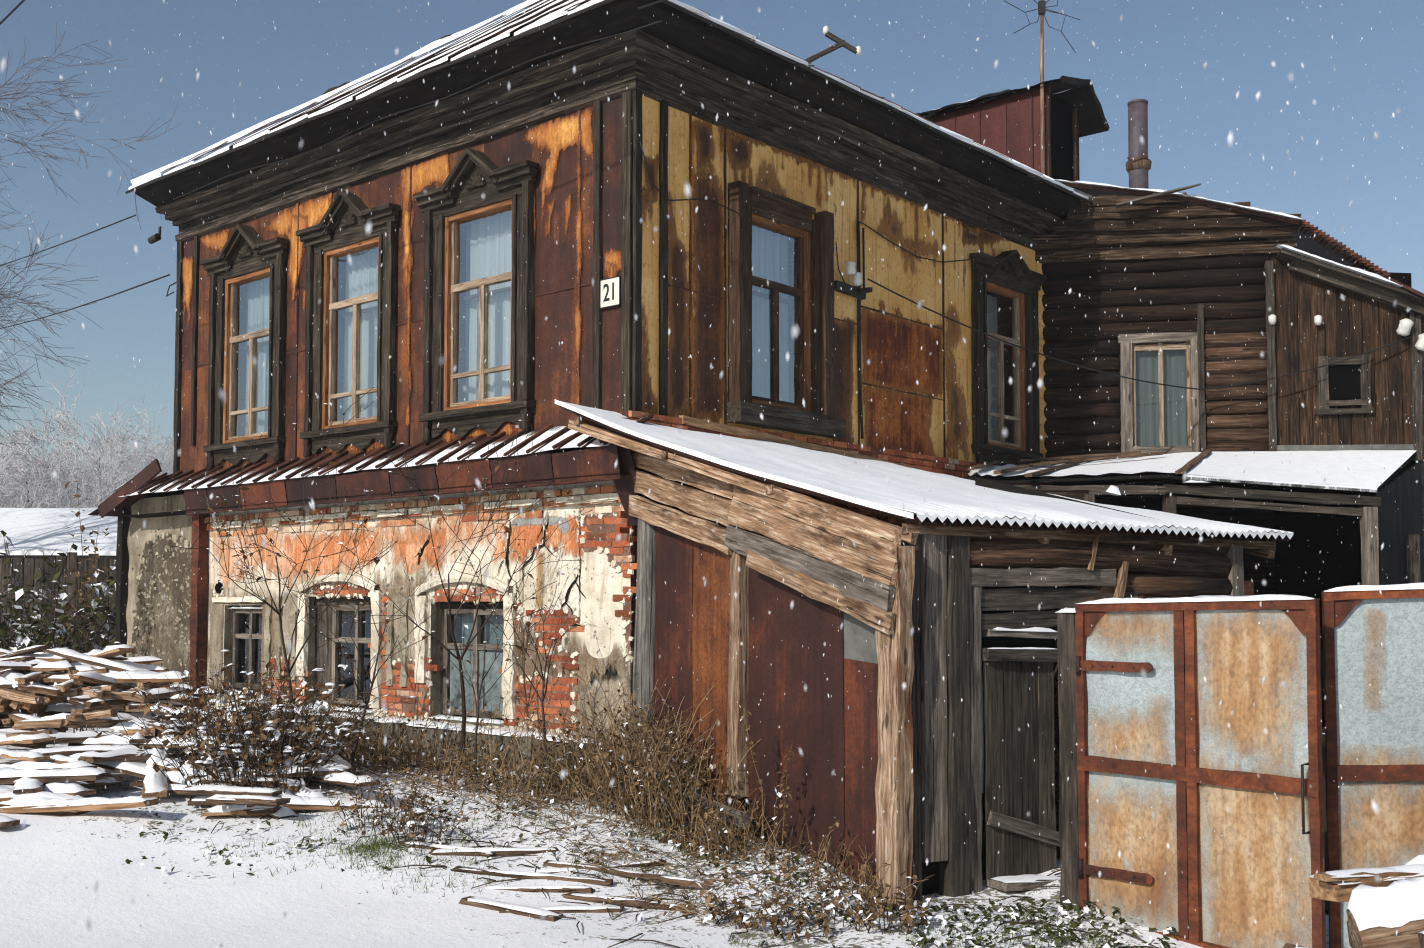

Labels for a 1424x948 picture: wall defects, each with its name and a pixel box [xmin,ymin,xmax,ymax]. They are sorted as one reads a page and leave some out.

corrosion [641,119,1008,423]
corrosion [833,301,969,461]
spalling [213,529,441,721]
spalling [429,583,585,735]
spalling [399,512,637,663]
corrosion [1089,611,1169,643]
corrosion [1095,710,1165,763]
corrosion [1088,791,1177,917]
corrosion [1203,609,1297,762]
corrosion [1205,784,1309,948]
corrosion [1339,750,1424,870]